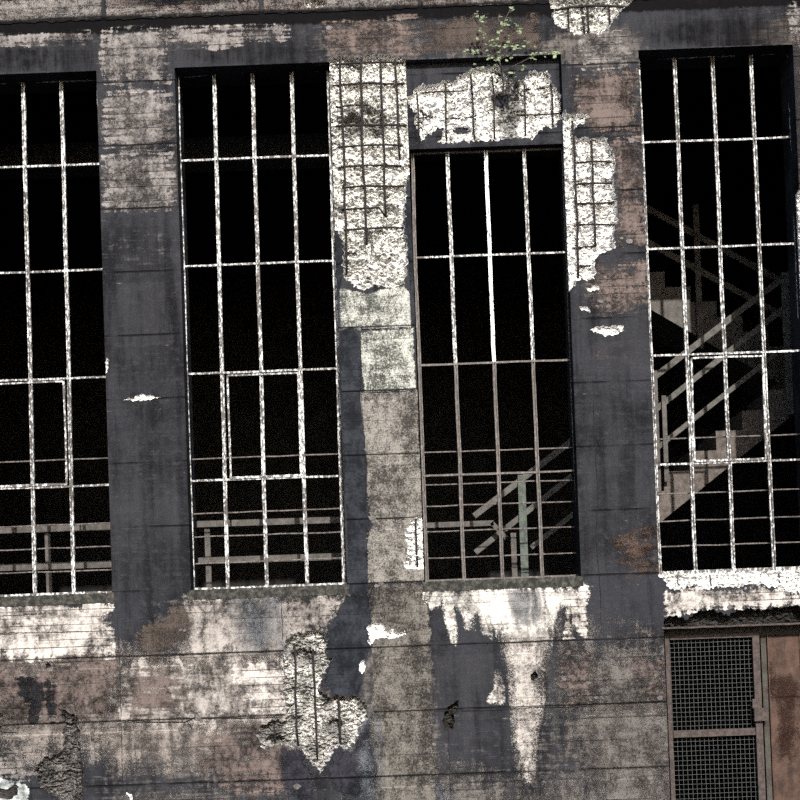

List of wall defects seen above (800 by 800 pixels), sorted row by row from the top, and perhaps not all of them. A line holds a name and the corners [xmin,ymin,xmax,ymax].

peeling [0,23,291,213]
peeling [777,1,800,132]
spalling [125,393,161,401]
spalling [321,0,670,800]
spalling [0,595,369,800]
leakage [423,582,590,781]
peeling [658,570,800,627]
corrosion [769,663,800,762]